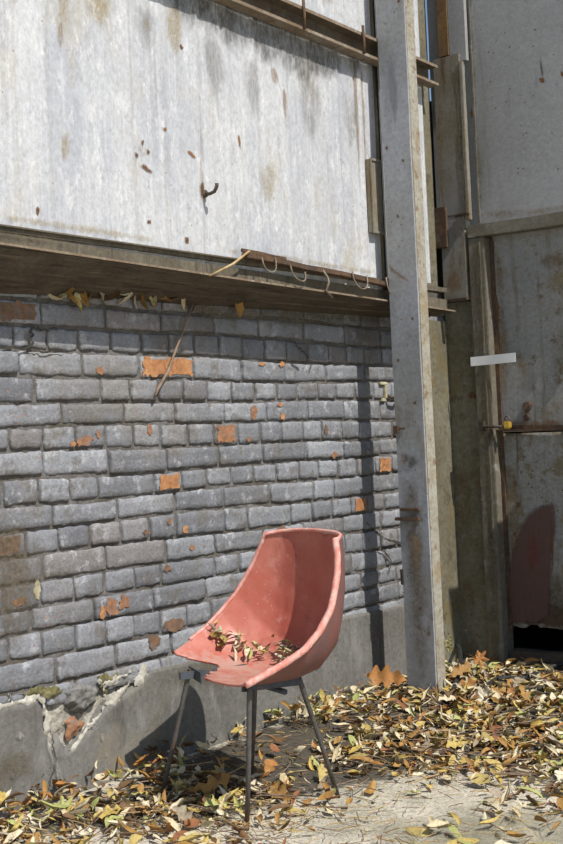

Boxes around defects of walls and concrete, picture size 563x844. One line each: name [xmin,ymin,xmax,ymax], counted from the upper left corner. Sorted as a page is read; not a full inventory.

water stain [174,0,339,80]
spalling [143,356,194,377]
spalling [217,424,236,443]
corrosion [489,241,514,630]
spalling [160,472,180,490]
spalling [0,664,148,753]